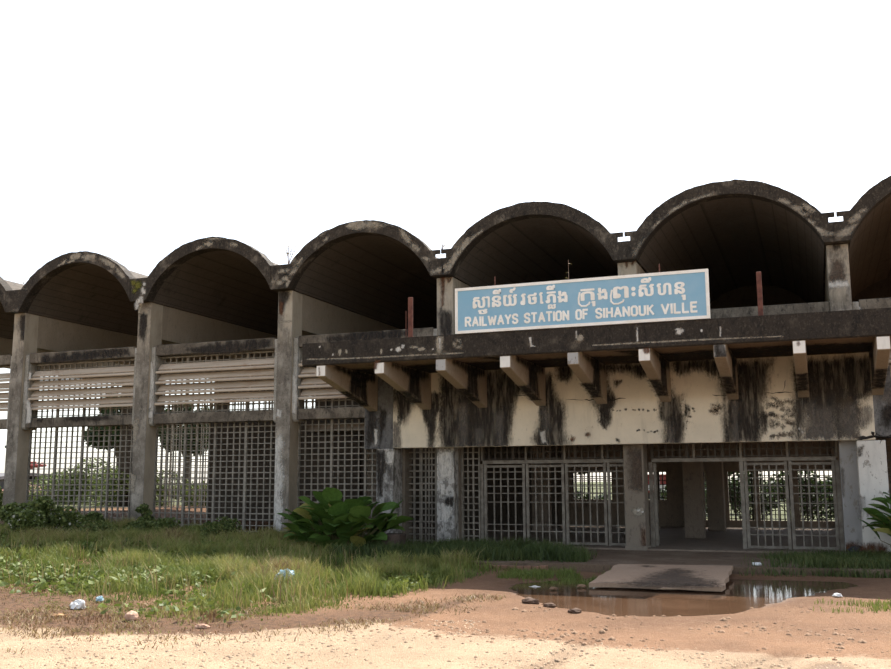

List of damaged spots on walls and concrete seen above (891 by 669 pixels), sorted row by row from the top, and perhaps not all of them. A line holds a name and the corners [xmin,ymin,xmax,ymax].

damp [307,336,572,497]
damp [581,328,891,456]